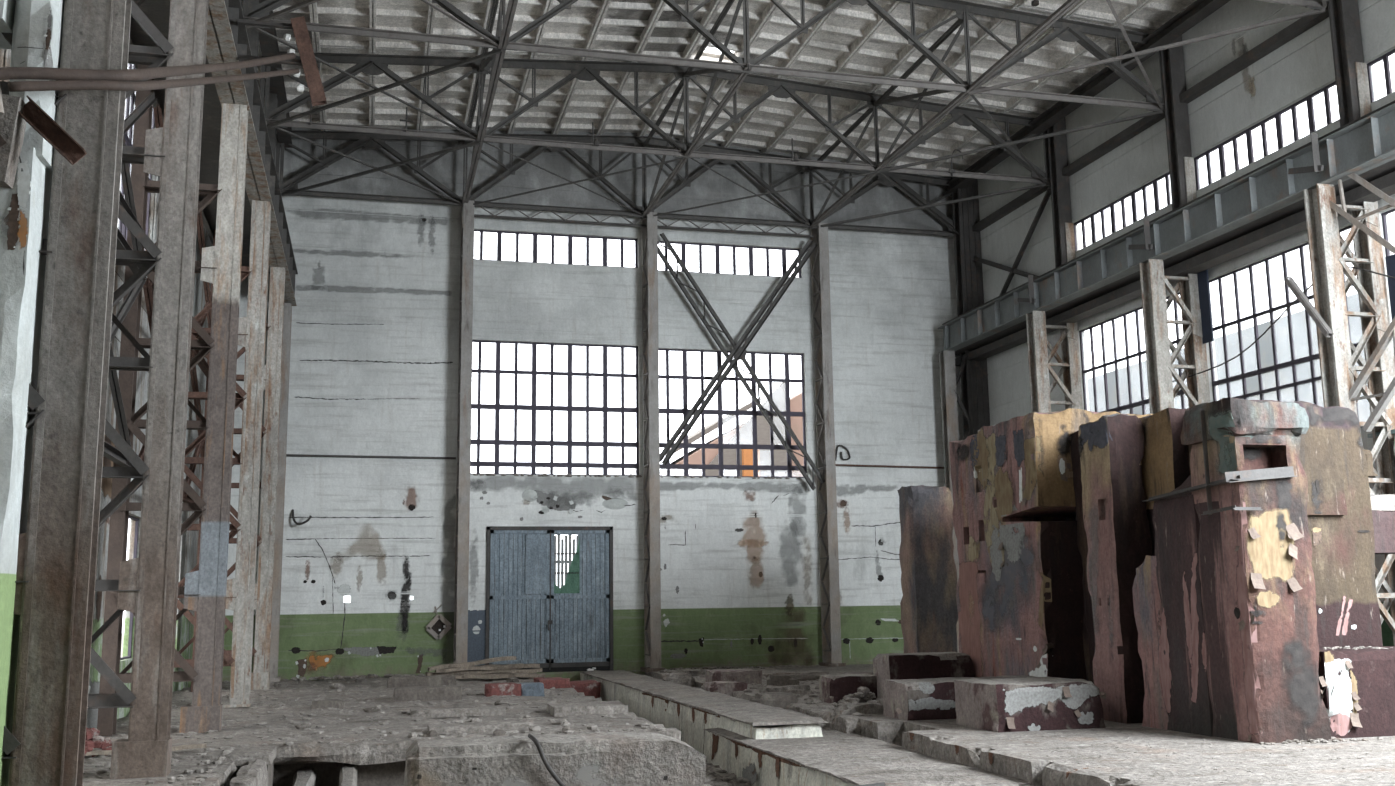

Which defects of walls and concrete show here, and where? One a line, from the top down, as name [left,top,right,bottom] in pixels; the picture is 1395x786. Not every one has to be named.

spalling [4,160,31,252]
peeling [520,490,582,521]
peeling [1234,501,1322,741]
peeling [1319,650,1363,736]